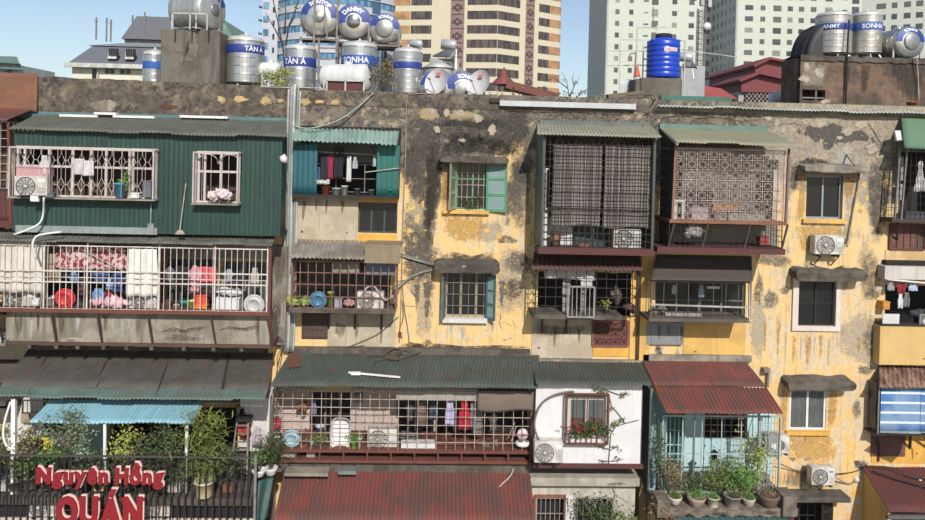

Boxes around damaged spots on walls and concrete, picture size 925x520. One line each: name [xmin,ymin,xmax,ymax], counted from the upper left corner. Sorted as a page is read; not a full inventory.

flaking render [418,108,497,136]
peeling [763,114,785,133]
flaking render [798,119,895,168]
leakage [402,108,533,318]
leakage [868,165,890,236]
leakage [755,275,789,307]
leakage [759,255,790,266]
leakage [860,254,879,299]